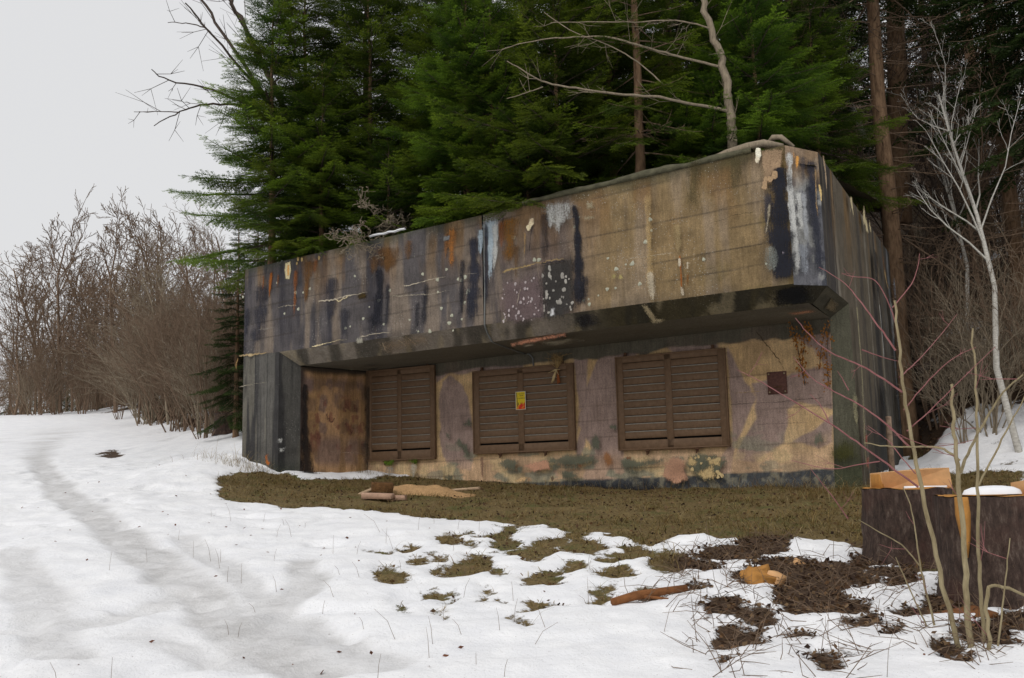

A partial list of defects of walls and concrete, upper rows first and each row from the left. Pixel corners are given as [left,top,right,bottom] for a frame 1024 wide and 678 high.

spalling [755,148,782,190]
leakage [371,269,389,326]
leakage [459,219,500,320]
peeling [502,265,574,323]
leakage [546,201,597,327]
leakage [762,153,826,306]